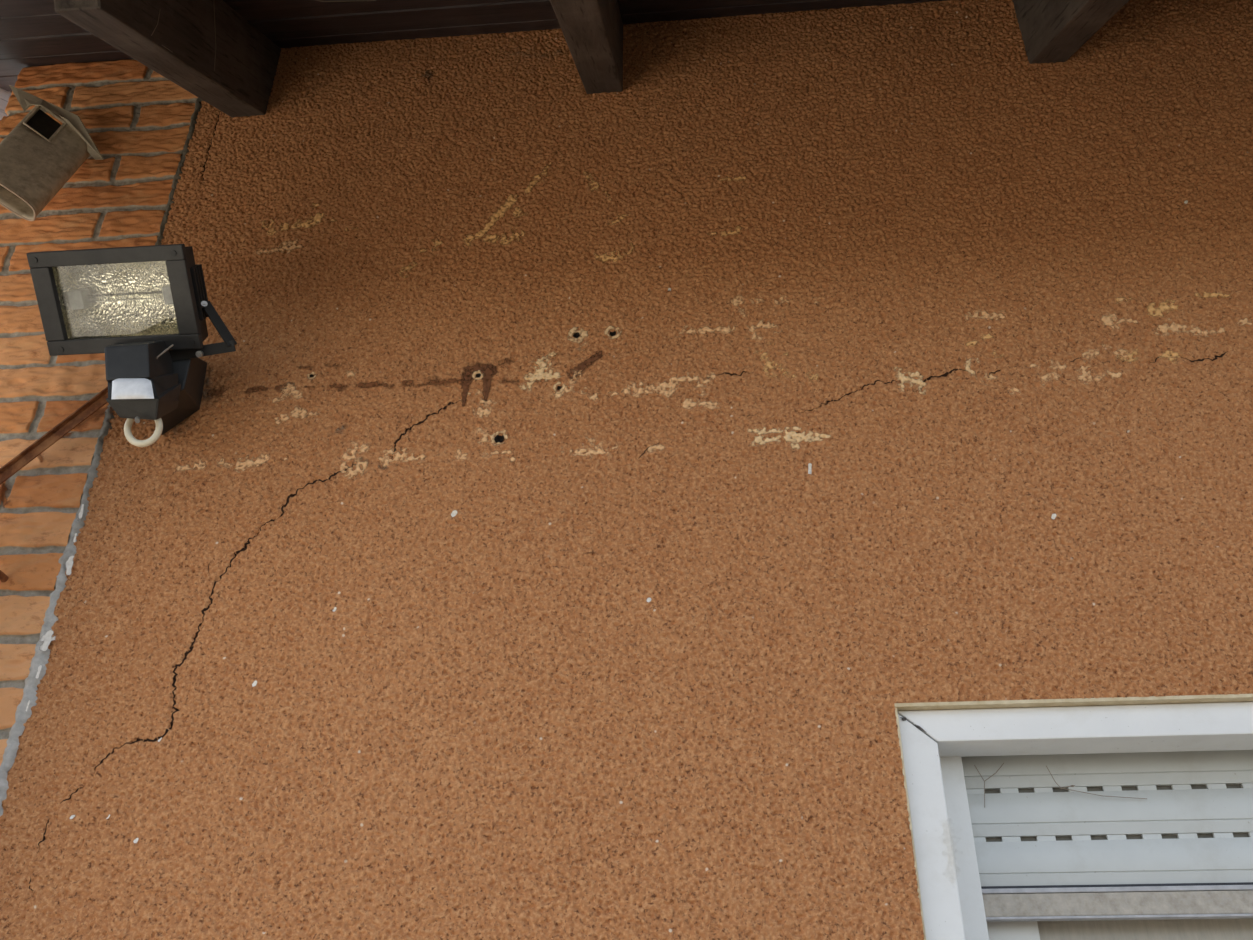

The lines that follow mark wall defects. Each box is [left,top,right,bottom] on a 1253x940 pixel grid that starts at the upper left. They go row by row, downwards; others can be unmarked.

crack [1122,351,1228,363]
peeling [520,352,720,409]
crack [795,369,1000,413]
peeling [748,426,831,449]
crack [29,400,460,891]